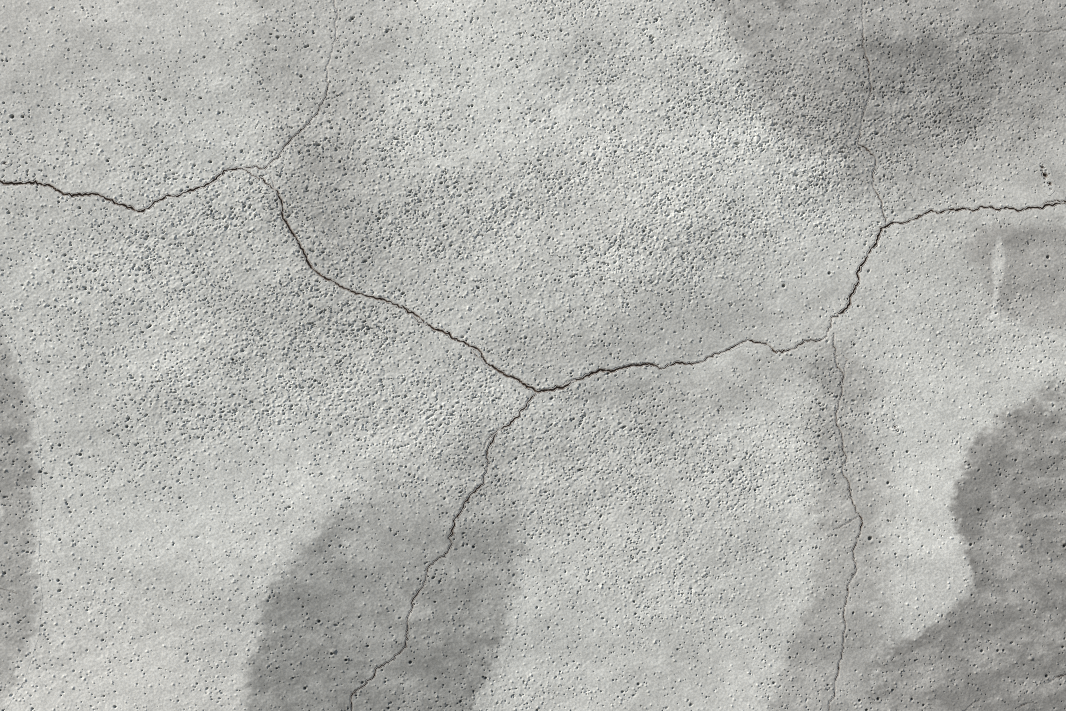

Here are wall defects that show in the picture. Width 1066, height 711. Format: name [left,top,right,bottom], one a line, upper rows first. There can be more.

crack [0,0,1066,394]
damp [0,321,43,711]
damp [239,427,526,711]
crack [350,392,537,711]
damp [473,273,1066,711]
crack [828,334,864,711]
crack [1016,673,1066,709]